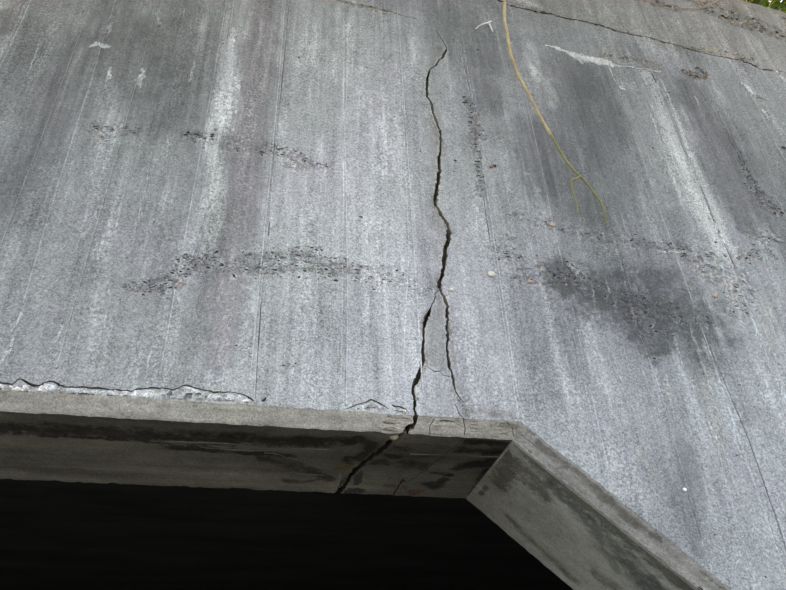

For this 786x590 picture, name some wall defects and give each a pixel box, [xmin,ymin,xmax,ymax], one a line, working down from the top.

crack [498,0,786,73]
crack [337,0,465,495]
damp [544,256,741,364]
spalling [0,383,256,404]